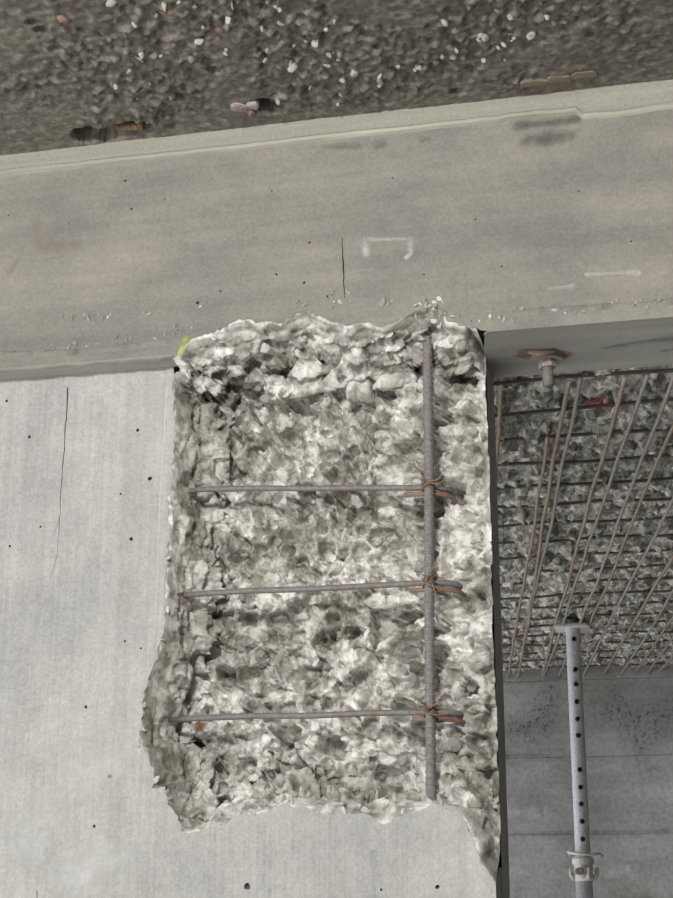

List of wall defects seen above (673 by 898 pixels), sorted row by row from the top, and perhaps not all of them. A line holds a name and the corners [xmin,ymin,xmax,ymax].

crack [51,388,68,574]
spalling [138,307,673,884]